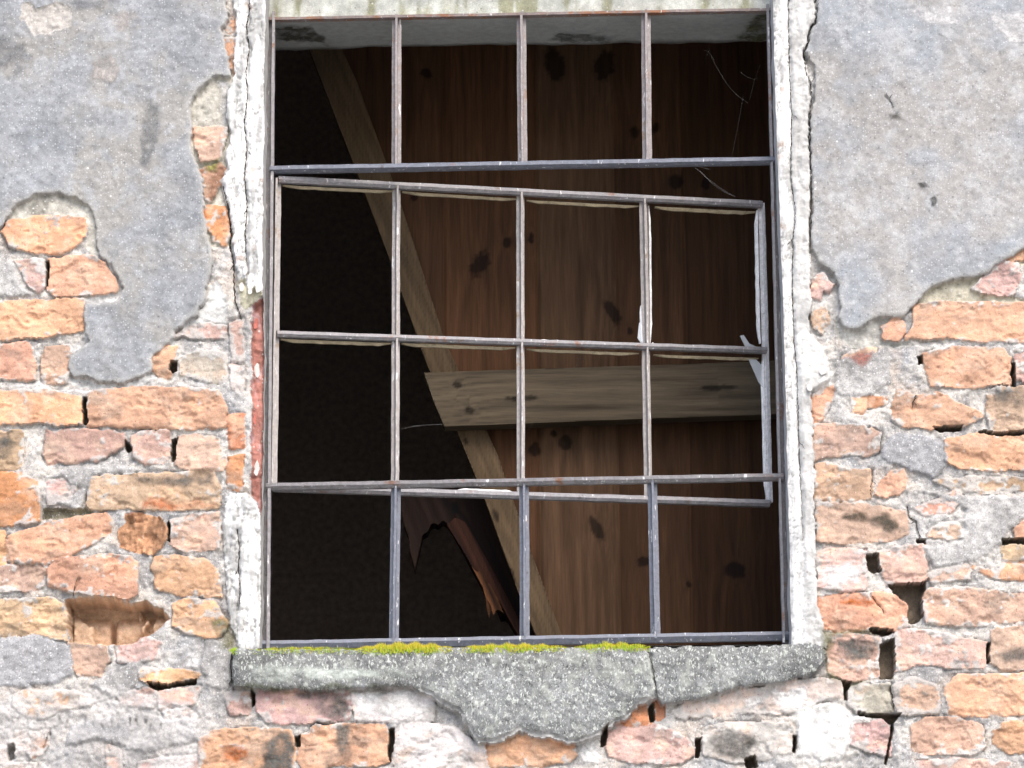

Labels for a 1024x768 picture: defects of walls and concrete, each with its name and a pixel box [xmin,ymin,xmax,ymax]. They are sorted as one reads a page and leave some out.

crack [223,1,251,320]
crack [788,3,819,533]
flaking render [808,258,924,365]
peeling [168,263,265,513]
peeling [933,424,964,433]
peeling [979,429,1024,437]
peeling [43,506,94,520]
peeling [866,551,883,574]
spalling [65,594,170,646]
peeling [888,580,927,624]
peeling [869,626,897,680]
peeling [858,710,902,765]